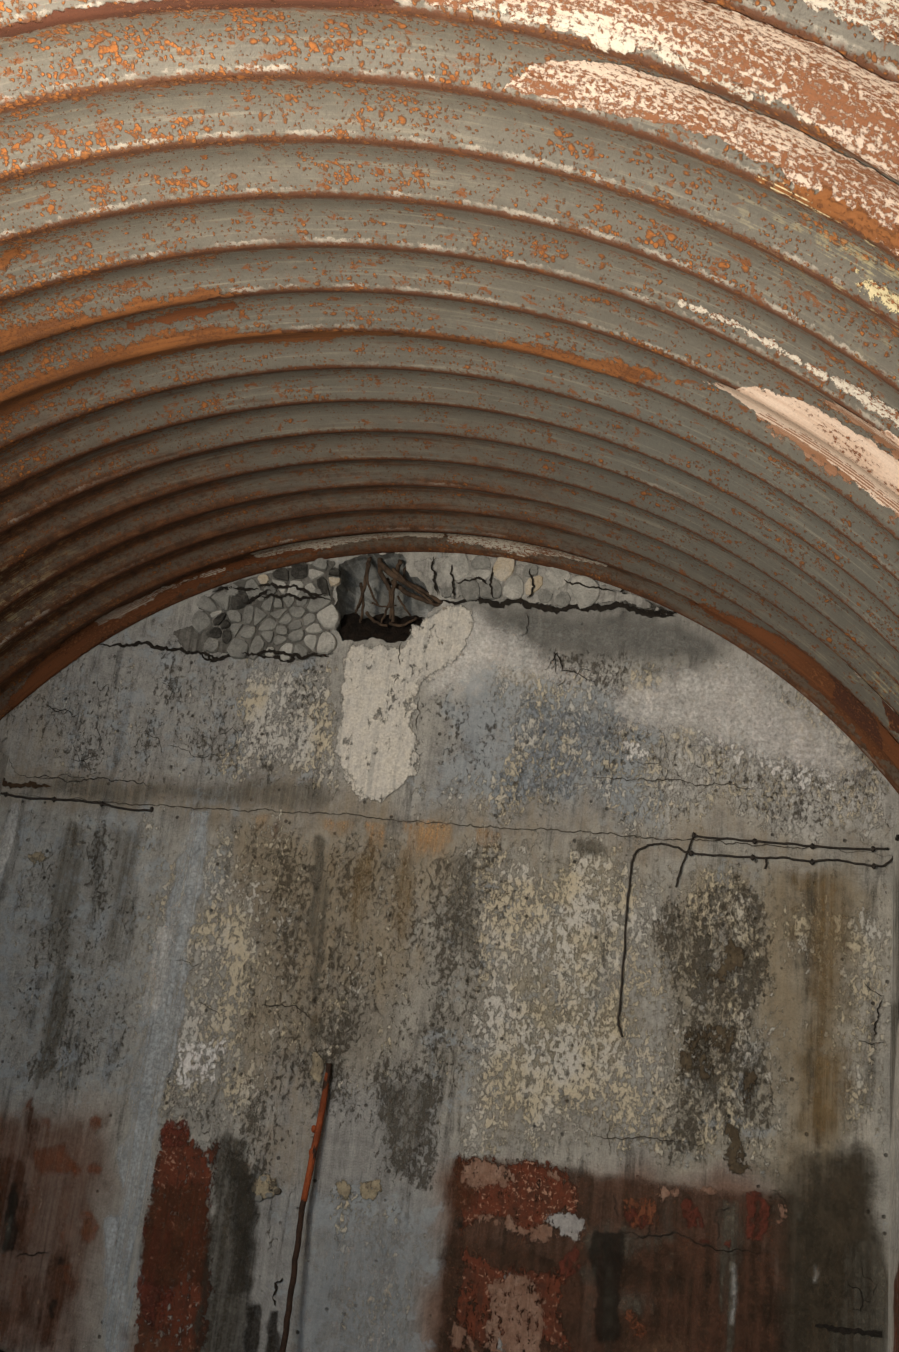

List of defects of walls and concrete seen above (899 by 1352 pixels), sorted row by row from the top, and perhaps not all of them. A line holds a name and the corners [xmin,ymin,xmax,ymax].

corrosion [0,0,399,38]
peeling [424,0,899,256]
corrosion [0,285,683,420]
peeling [677,299,899,520]
peeling [855,269,899,313]
corrosion [8,532,608,712]
peeling [173,552,671,803]
crack [442,589,676,634]
crack [544,648,595,685]
leakage [103,788,250,1352]
leakage [781,873,899,1352]
leakage [194,1133,280,1352]